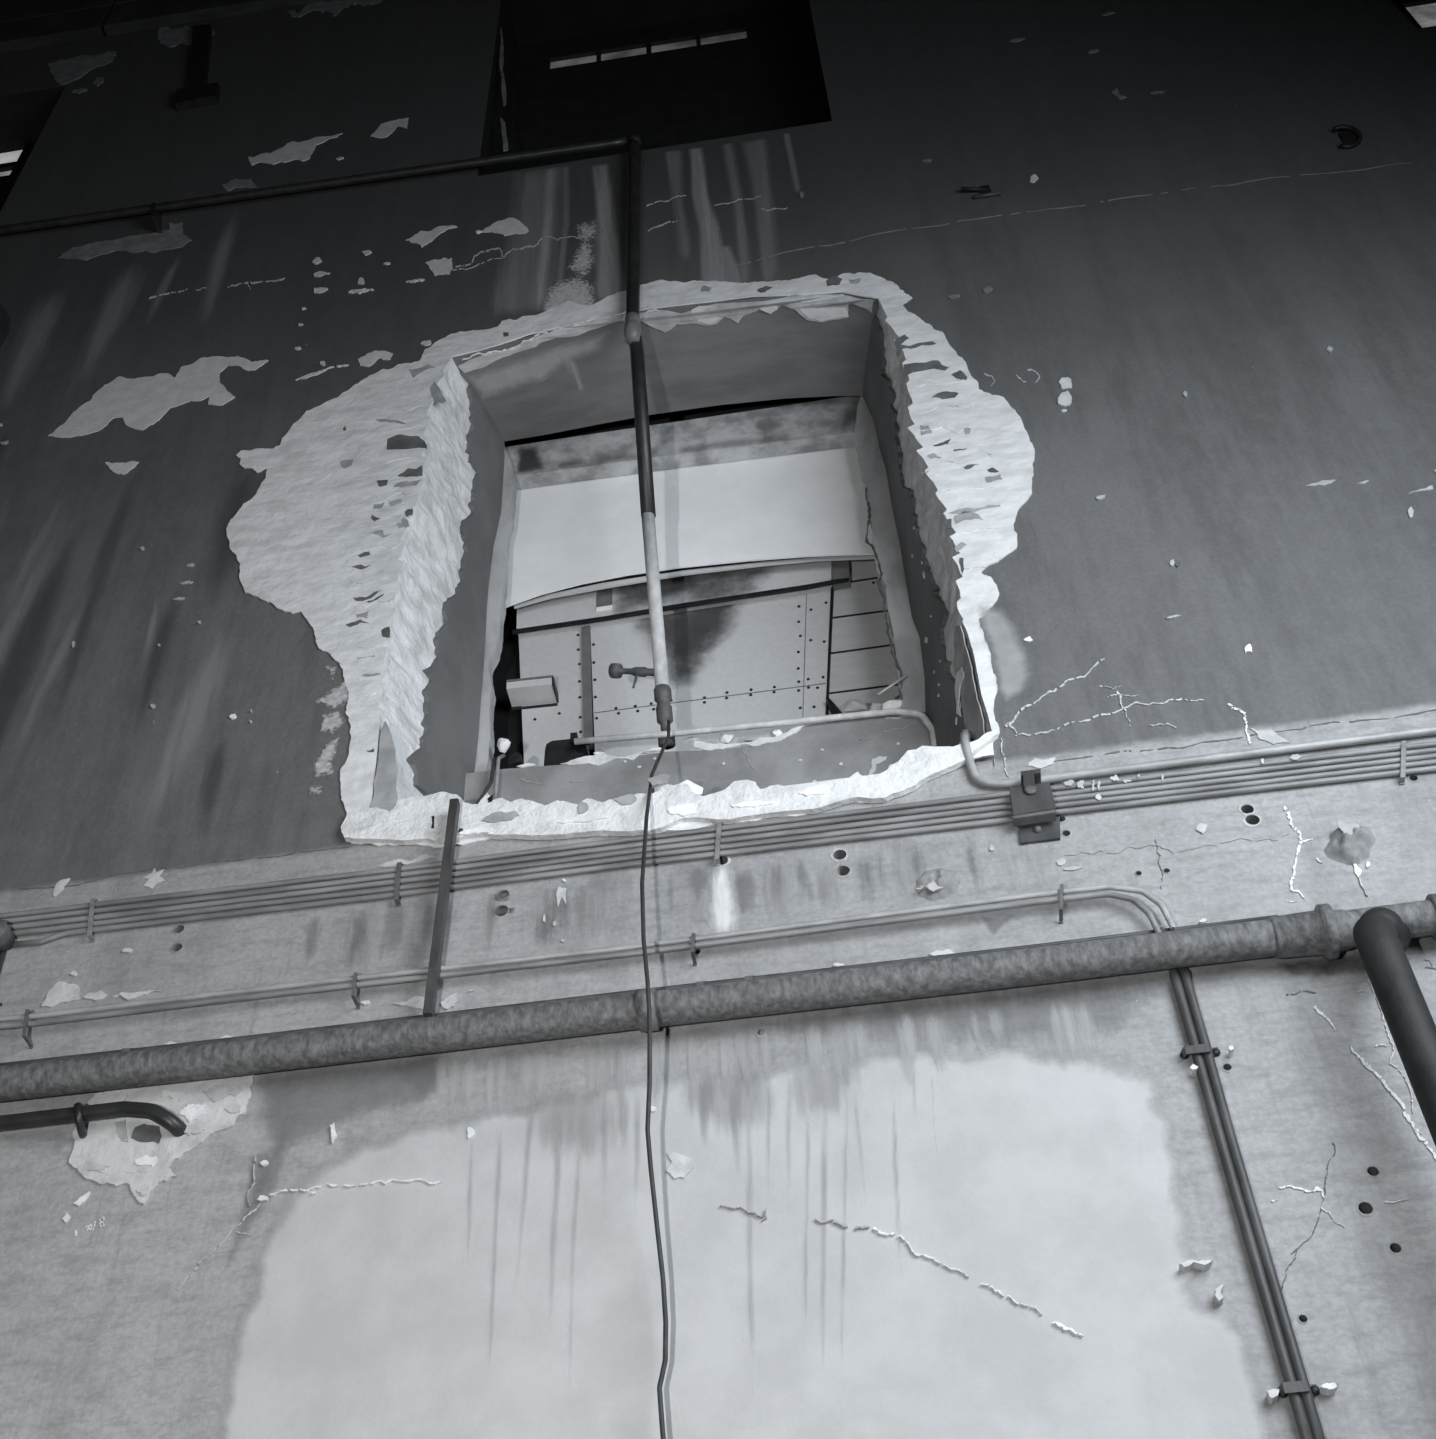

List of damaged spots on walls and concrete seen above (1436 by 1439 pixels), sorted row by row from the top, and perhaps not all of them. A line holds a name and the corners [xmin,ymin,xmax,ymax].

peeling [222,133,343,191]
peeling [371,117,409,138]
peeling [58,222,192,261]
peeling [48,356,269,438]
flaking render [226,272,1035,868]
crack [1001,658,1436,777]
crack [1064,806,1322,903]
crack [1284,963,1436,1160]
flaking render [62,1074,255,1223]
crack [178,1156,442,1290]
crack [815,1218,1083,1338]
crack [1271,1142,1345,1289]